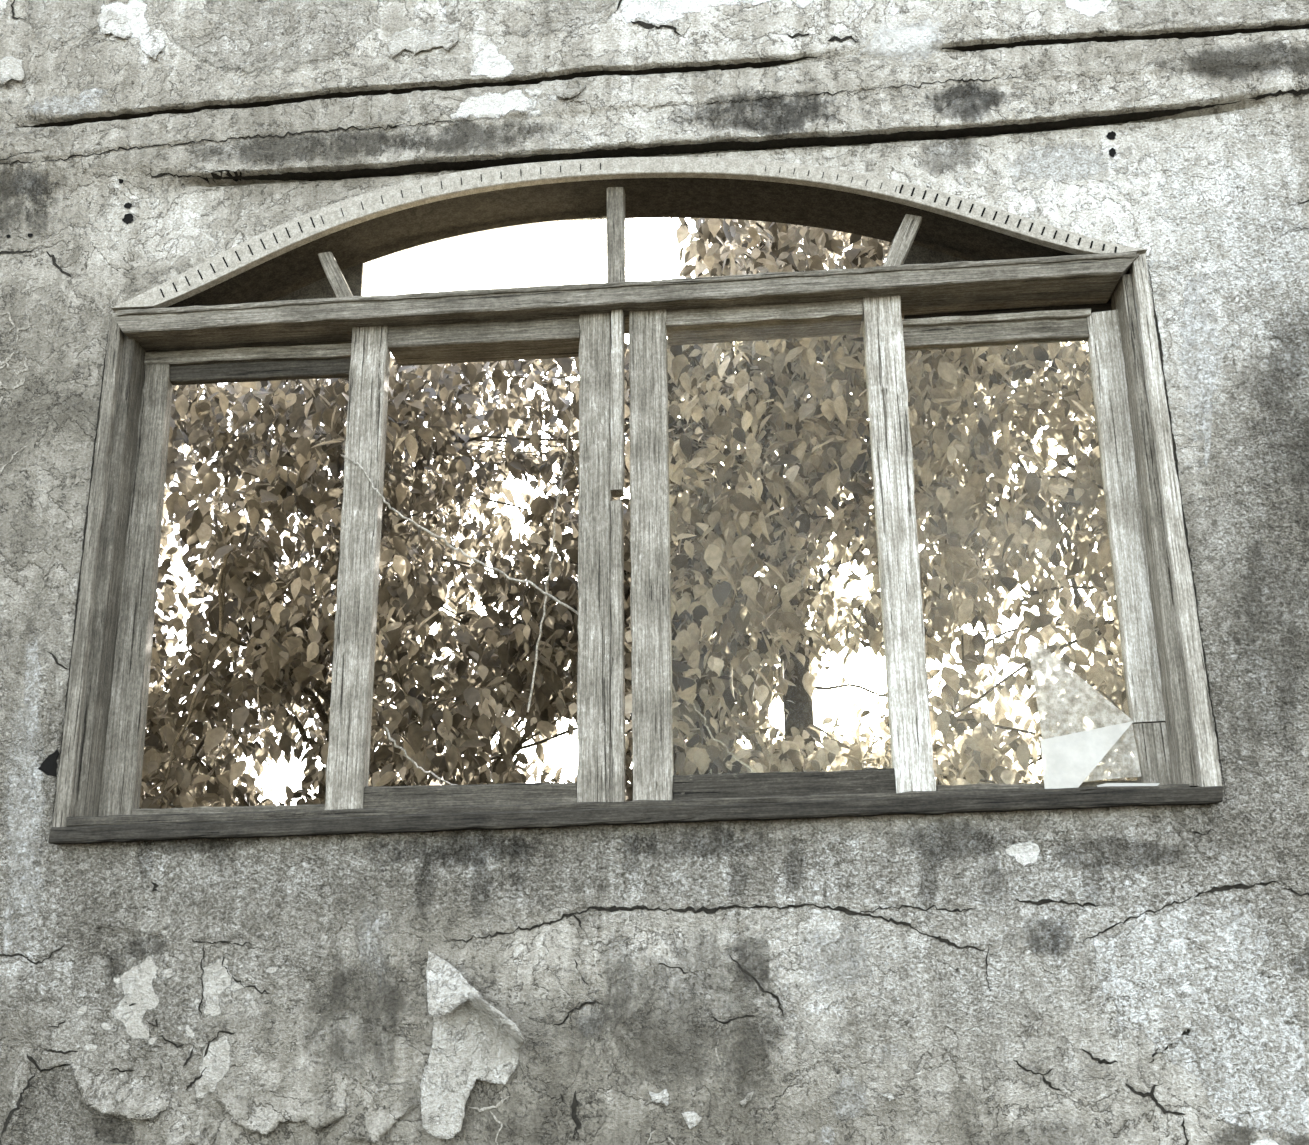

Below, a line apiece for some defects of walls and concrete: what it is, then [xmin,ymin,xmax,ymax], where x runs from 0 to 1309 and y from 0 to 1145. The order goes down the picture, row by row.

flaking render [97,0,165,60]
crack [617,0,682,36]
flaking render [621,0,813,24]
flaking render [1064,0,1112,17]
crack [0,24,1309,183]
crack [1015,881,1309,945]
flaking render [76,955,176,1050]
peeling [183,951,525,1143]
flaking render [11,1044,173,1145]
flaking render [166,1129,217,1145]